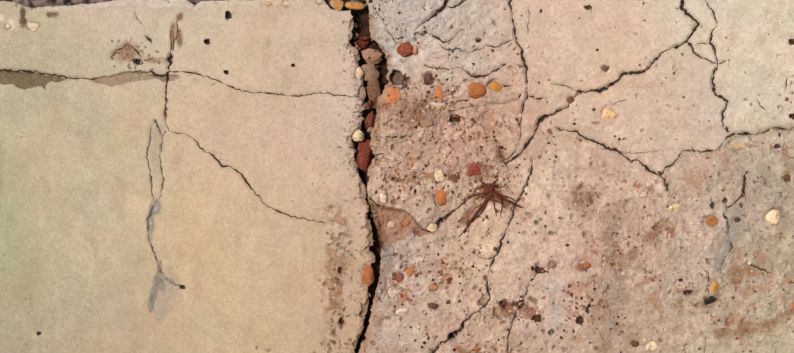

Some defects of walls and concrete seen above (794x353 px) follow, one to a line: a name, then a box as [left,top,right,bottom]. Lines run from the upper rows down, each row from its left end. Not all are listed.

spalling [0,71,65,89]
crack [0,69,97,80]
spalling [93,72,179,86]
crack [110,0,412,353]
crack [404,0,793,353]